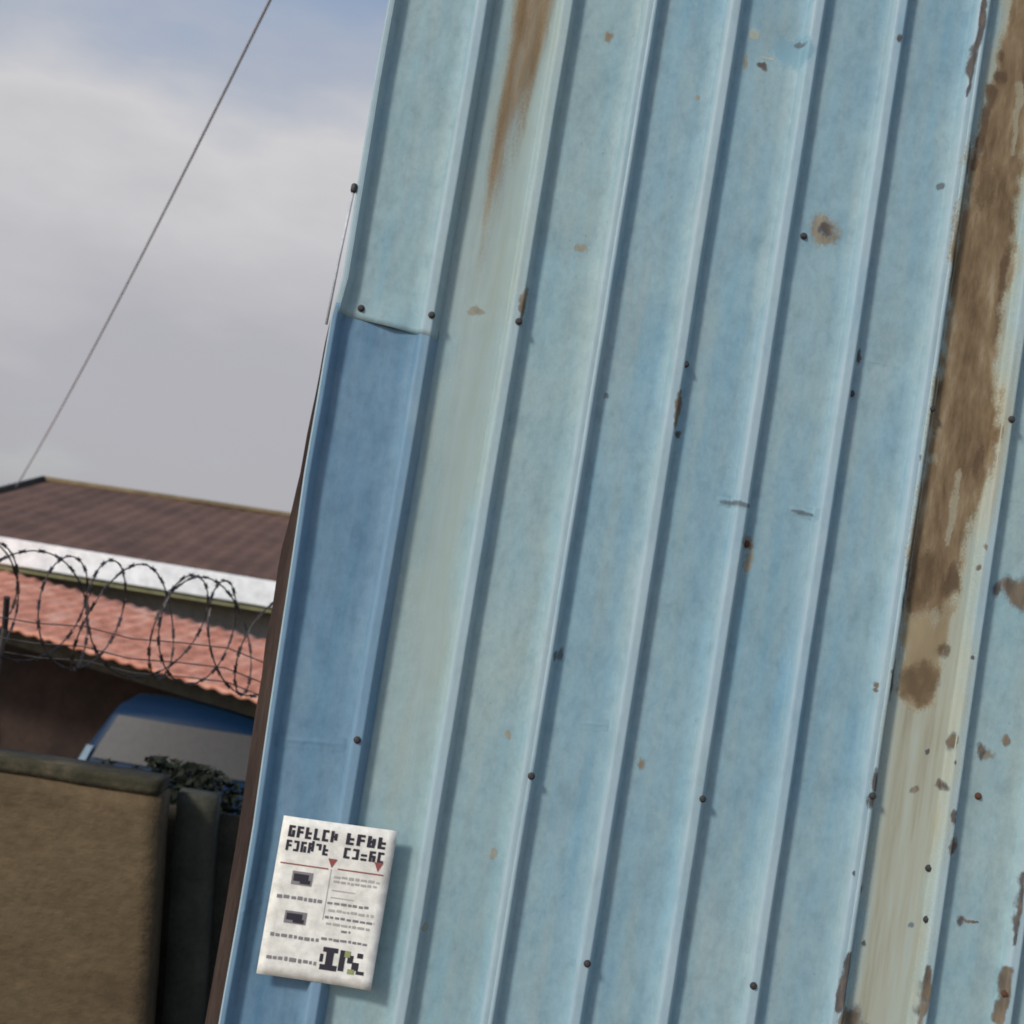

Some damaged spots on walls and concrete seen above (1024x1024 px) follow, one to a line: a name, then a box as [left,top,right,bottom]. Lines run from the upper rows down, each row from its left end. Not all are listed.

rust [490,0,548,192]
rust [811,214,839,245]
rust [518,288,528,319]
rust [873,0,1024,709]
rust [674,390,682,438]
rust [946,733,959,764]
rust [977,742,993,760]
rust [1013,872,1024,945]
rust [835,952,863,1024]
rust [914,965,932,1024]
rust [991,966,1014,1024]